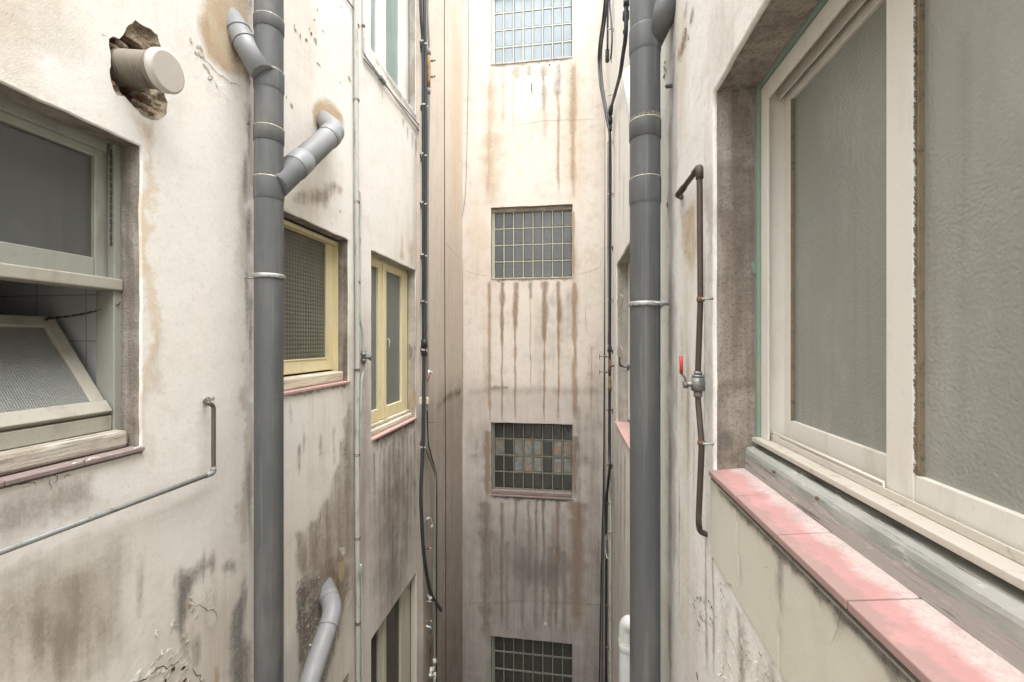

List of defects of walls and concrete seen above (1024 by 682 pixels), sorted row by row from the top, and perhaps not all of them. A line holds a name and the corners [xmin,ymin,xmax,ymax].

flaking render [105,20,161,54]
water stain [179,0,250,103]
flaking render [110,78,168,120]
water stain [179,571,198,623]
flaking render [130,621,205,682]
water stain [232,594,248,682]